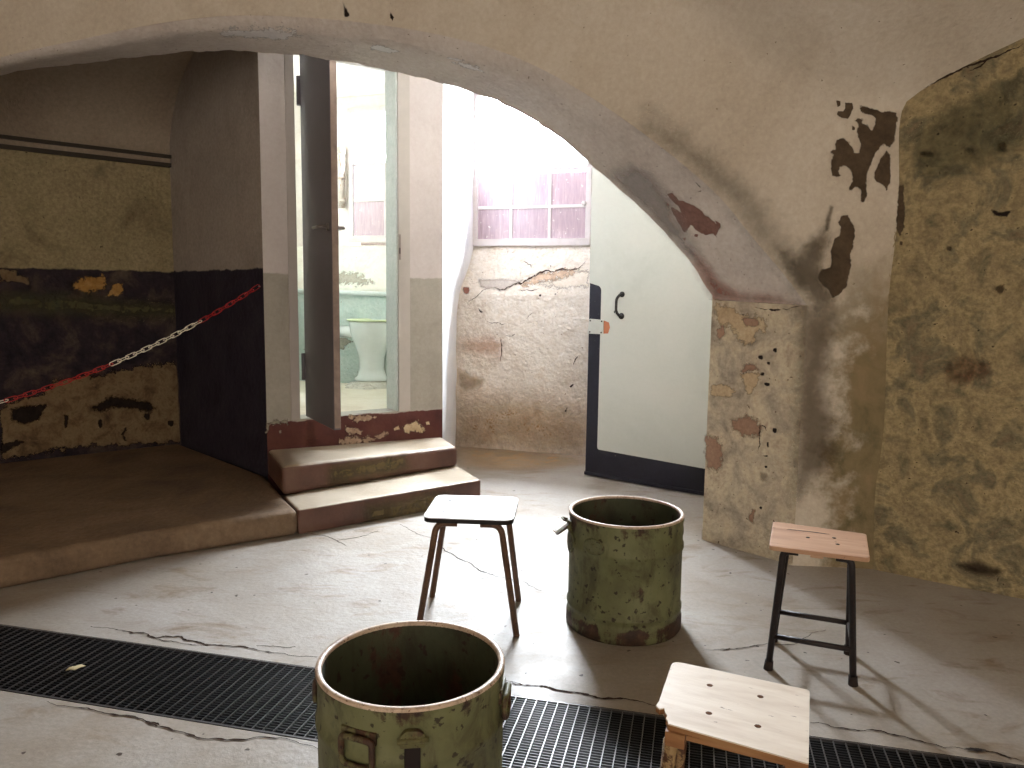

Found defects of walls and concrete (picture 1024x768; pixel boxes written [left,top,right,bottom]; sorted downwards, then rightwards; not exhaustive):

peeling [619,172,720,248]
flaking render [831,100,905,245]
flaking render [73,273,124,297]
crack [469,259,587,364]
water stain [791,207,832,303]
flaking render [818,215,855,298]
flaking render [0,361,180,460]
peeling [339,414,430,445]
flaking render [732,415,777,468]
water stain [800,316,831,476]
crack [91,626,313,657]
crack [48,701,318,749]